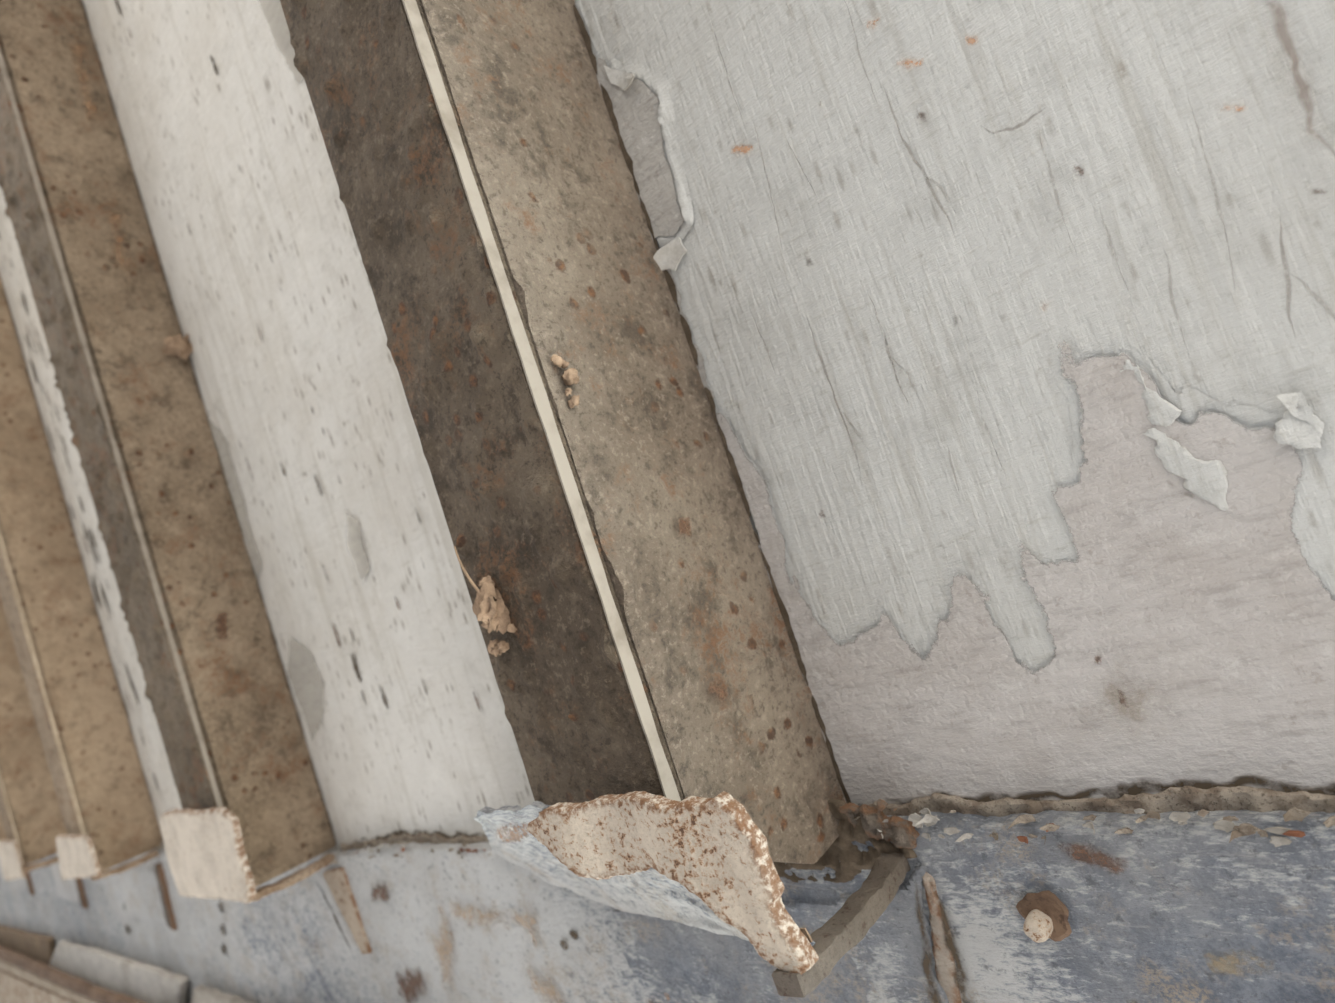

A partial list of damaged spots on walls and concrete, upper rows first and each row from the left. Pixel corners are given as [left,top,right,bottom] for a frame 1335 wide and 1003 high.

peeling [596,53,694,327]
peeling [693,327,1335,806]
crack [854,776,1335,847]
corrosion [396,968,426,1003]